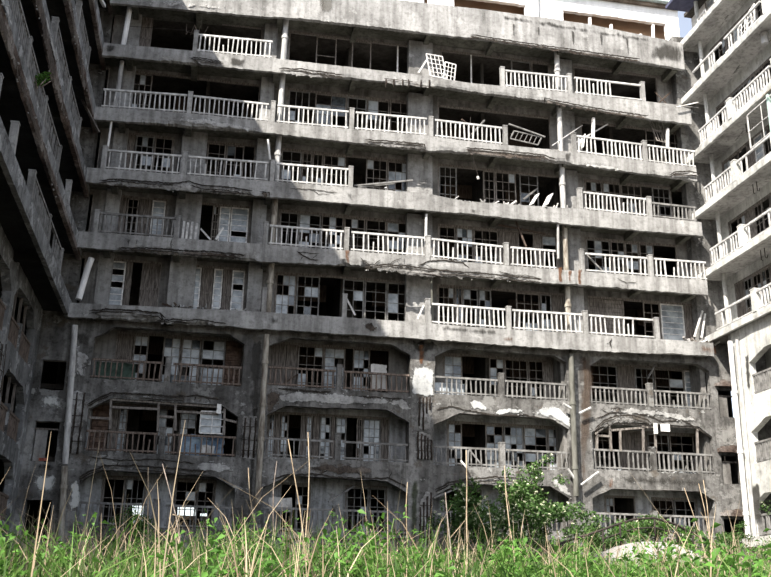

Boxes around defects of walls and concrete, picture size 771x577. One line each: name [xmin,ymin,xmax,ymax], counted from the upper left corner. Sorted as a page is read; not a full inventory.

flaking render [241,364,434,460]
flaking render [496,407,570,427]